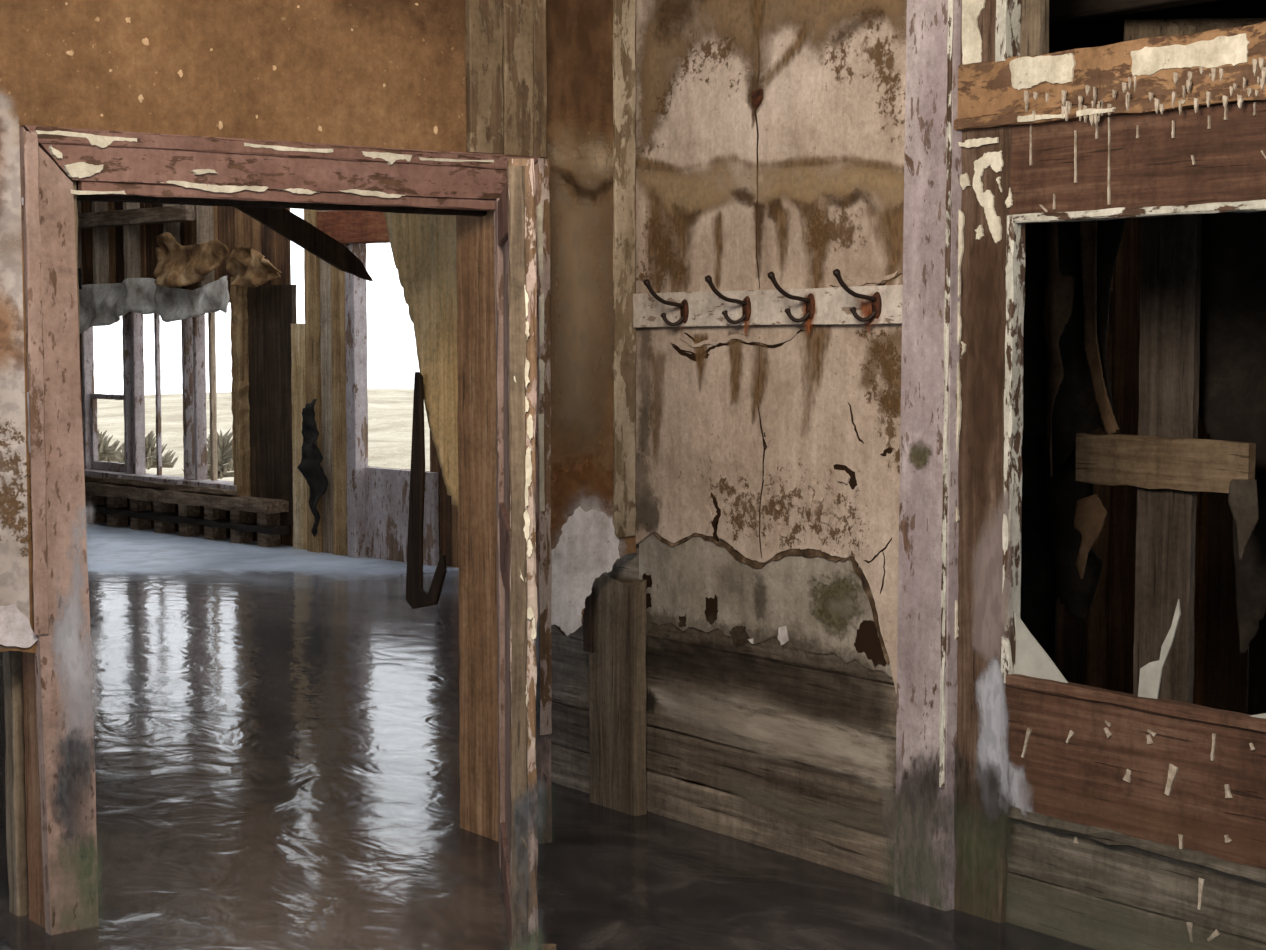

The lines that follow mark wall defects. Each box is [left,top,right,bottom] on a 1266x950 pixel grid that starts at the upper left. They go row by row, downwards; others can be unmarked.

crack [753,42,761,202]
damp [636,0,907,293]
peeling [1009,53,1076,91]
peeling [1130,33,1250,76]
peeling [0,95,32,622]
damp [729,339,766,418]
damp [805,324,830,397]
peeling [551,492,622,636]
damp [636,490,659,531]
crack [705,493,721,541]
crack [758,407,767,558]
flaking render [639,528,892,677]